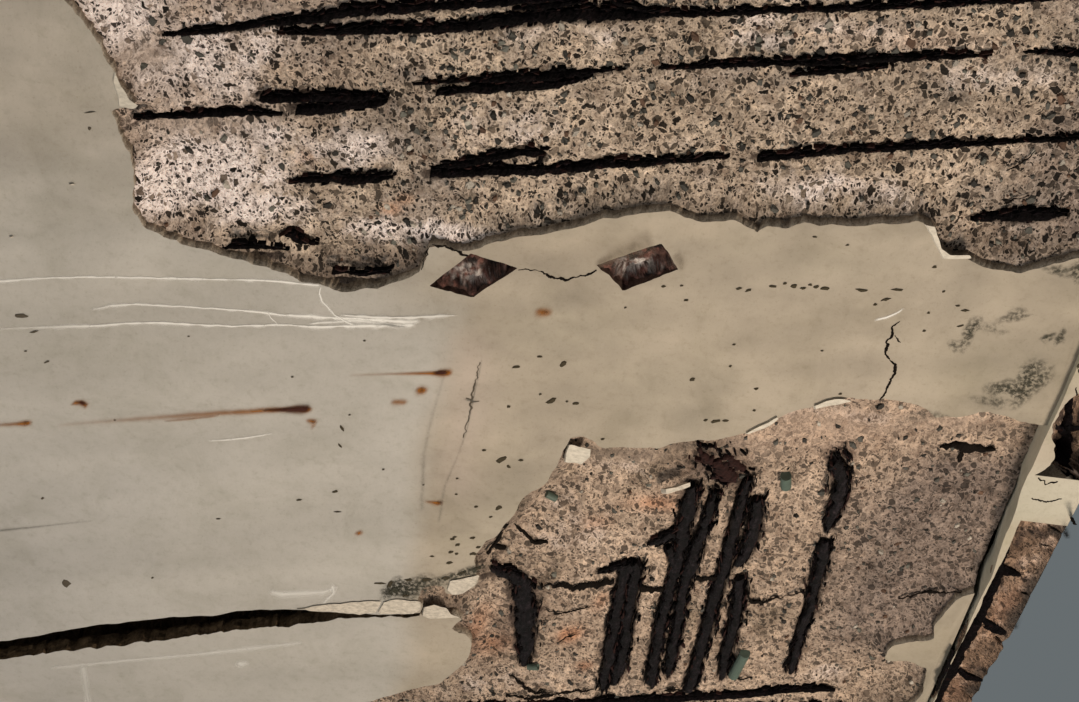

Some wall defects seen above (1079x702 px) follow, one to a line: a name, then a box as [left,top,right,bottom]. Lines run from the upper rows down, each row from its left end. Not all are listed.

spalling [64,0,1079,292]
damp [0,276,453,329]
crack [421,244,468,270]
crack [521,269,597,282]
crack [880,321,901,400]
corrosion [198,406,315,423]
spalling [1036,394,1079,480]
crack [1032,461,1077,525]
spalling [371,393,1066,702]